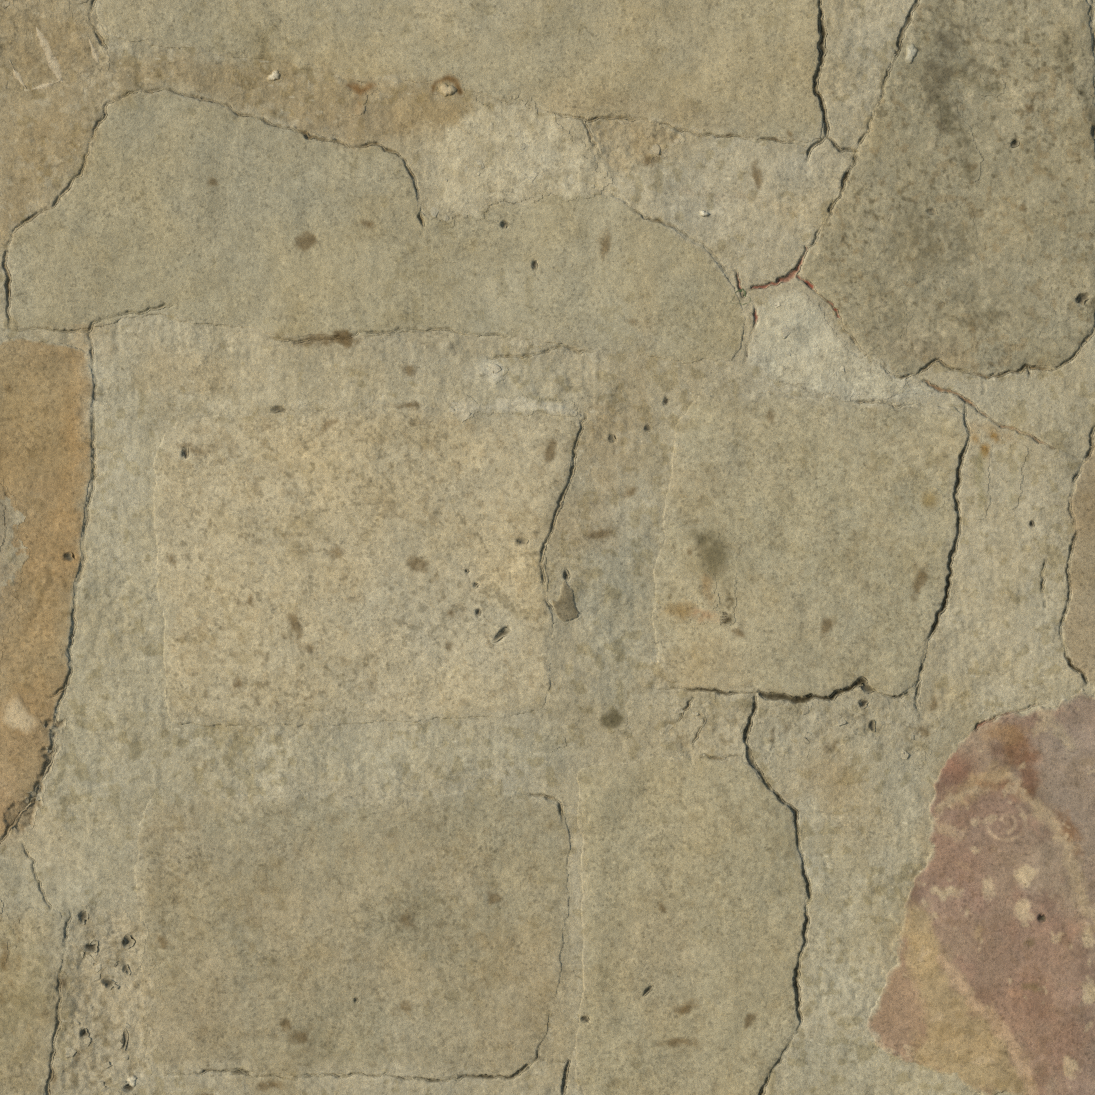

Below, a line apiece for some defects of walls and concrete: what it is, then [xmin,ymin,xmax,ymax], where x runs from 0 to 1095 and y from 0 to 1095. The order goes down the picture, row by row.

crack [90,0,107,49]
crack [270,328,596,359]
crack [540,413,586,613]
crack [556,0,1095,1095]
crack [0,88,424,1095]
crack [522,794,563,820]
crack [171,1045,570,1095]